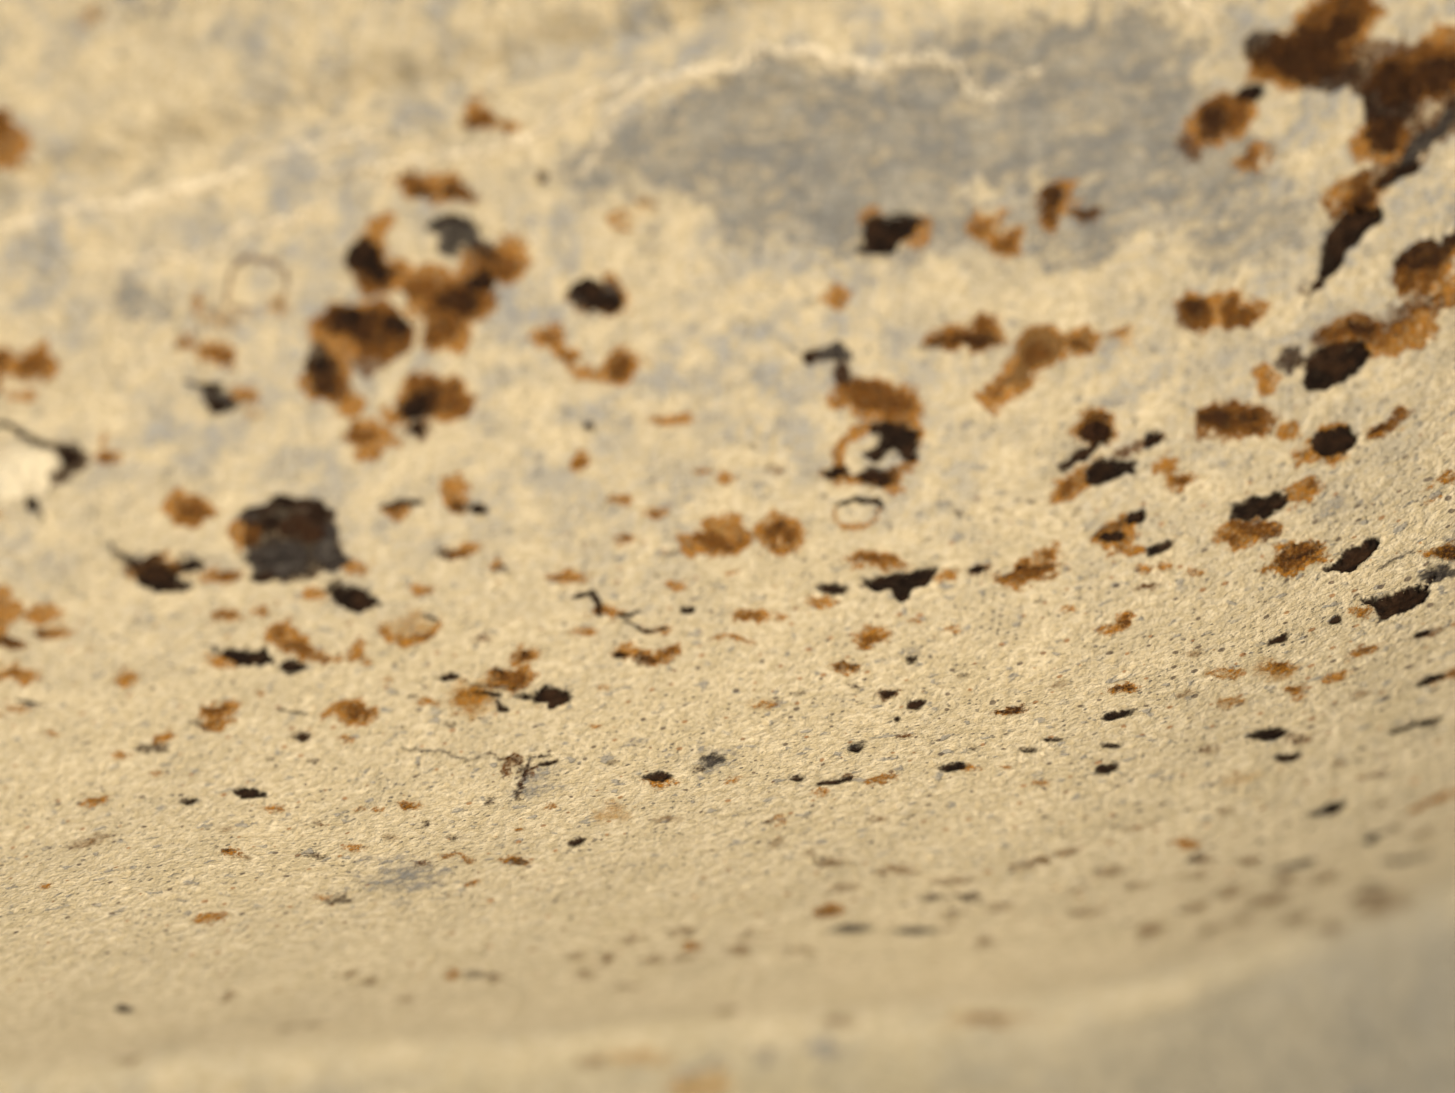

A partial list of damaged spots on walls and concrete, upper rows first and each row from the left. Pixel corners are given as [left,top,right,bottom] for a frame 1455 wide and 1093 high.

rust [1173,0,1455,222]
crack [1398,93,1455,175]
rust [296,210,534,462]
peeling [564,272,633,319]
rust [802,340,927,429]
peeling [856,205,932,256]
rust [921,309,1130,416]
rust [1195,231,1455,445]
crack [1297,205,1384,296]
peeling [109,493,381,614]
peeling [804,549,992,610]
peeling [1329,564,1455,624]